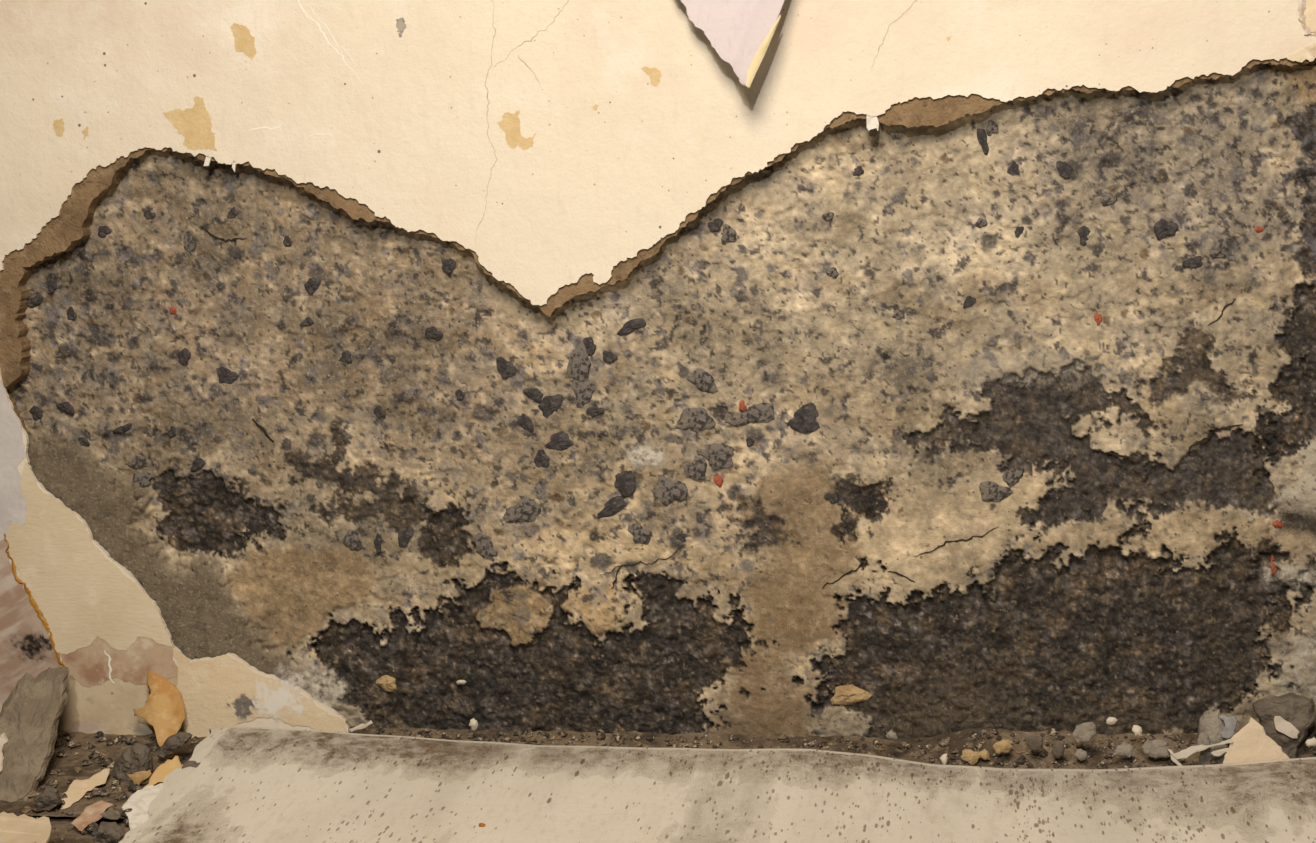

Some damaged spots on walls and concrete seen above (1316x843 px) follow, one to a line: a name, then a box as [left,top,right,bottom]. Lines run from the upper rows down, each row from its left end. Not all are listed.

flaking render [877,94,1006,128]
flaking render [255,168,391,222]
flaking render [535,207,704,316]
flaking render [0,147,156,432]
flaking render [496,357,517,379]
flaking render [567,341,592,382]
damp [936,344,1122,390]
efflorescence [1250,560,1316,590]
damp [707,471,865,737]
peeling [57,636,185,747]
peeling [1222,717,1290,764]
peeling [60,768,121,832]